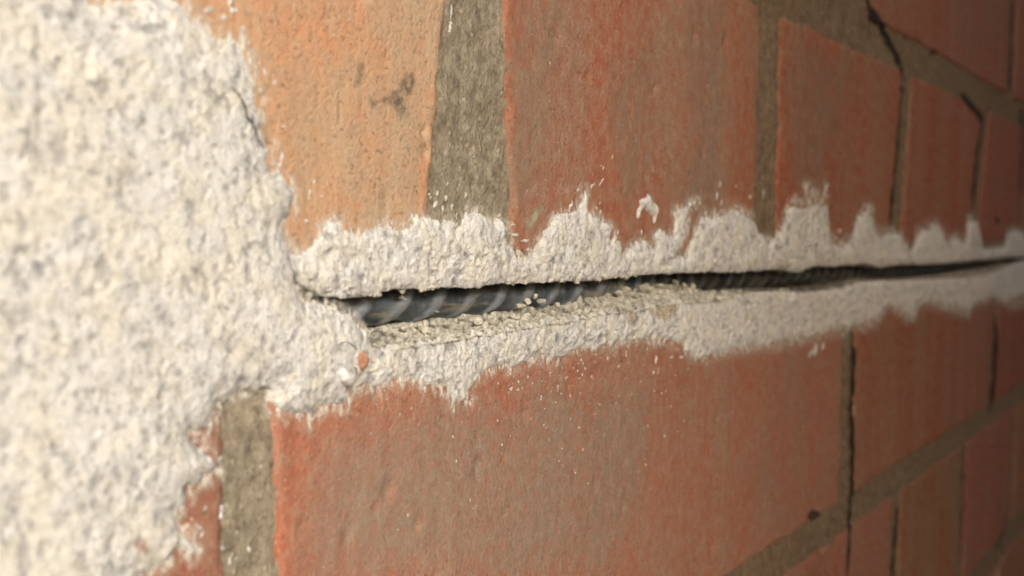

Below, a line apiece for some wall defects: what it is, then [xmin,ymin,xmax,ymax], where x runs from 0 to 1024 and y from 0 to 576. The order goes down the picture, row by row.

crack [867,0,904,227]
crack [960,92,984,213]
crack [847,333,856,573]